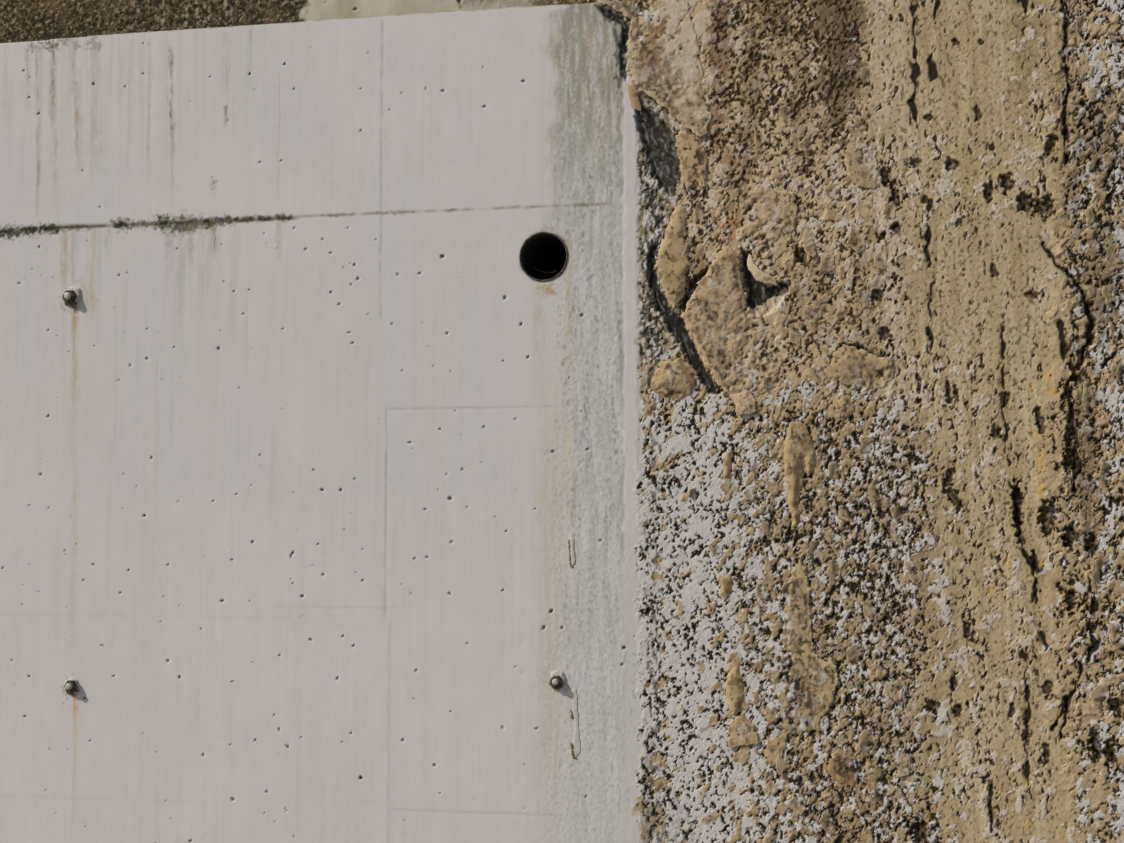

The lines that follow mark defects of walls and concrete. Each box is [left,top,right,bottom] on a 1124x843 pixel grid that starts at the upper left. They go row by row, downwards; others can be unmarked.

leakage [0,0,307,362]
leakage [376,209,415,217]
corrosion [58,276,102,649]
leakage [462,0,628,843]
spalling [595,0,1124,843]